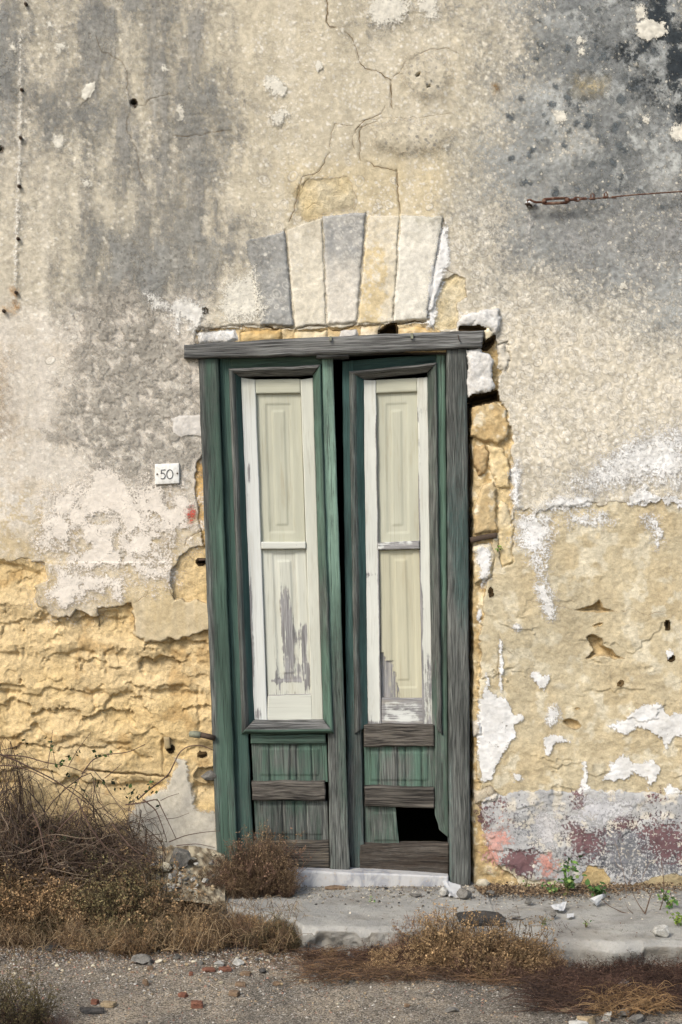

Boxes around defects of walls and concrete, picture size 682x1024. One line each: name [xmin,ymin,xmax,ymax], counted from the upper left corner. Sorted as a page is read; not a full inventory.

leakage [0,0,252,511]
spalling [142,263,384,344]
crack [289,0,459,221]
leakage [459,0,682,339]
spalling [0,457,215,861]
peeling [397,274,682,899]